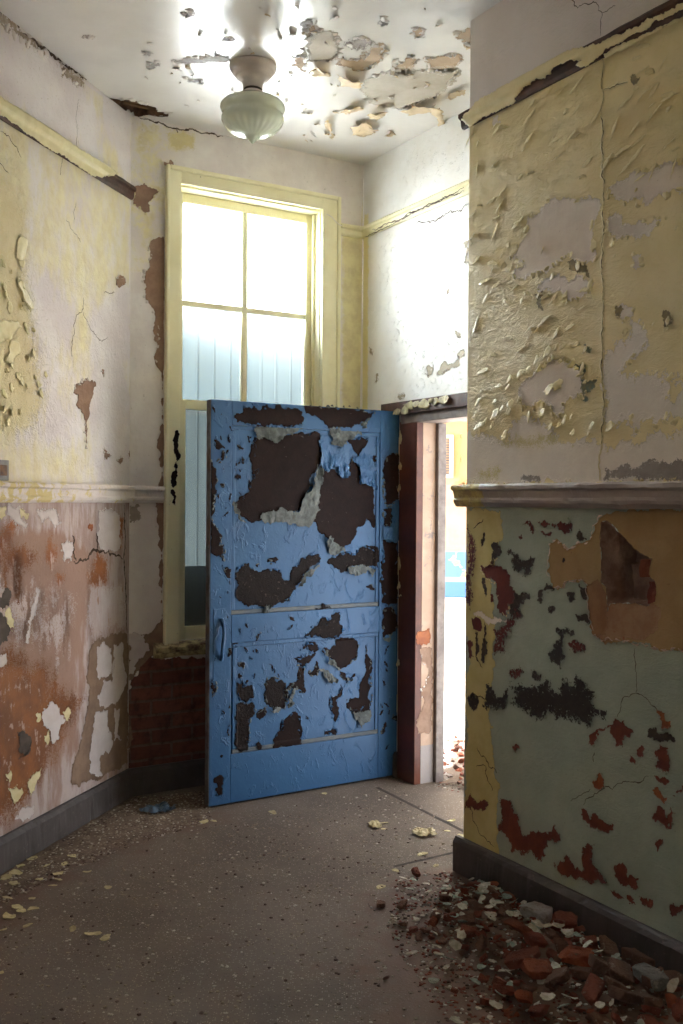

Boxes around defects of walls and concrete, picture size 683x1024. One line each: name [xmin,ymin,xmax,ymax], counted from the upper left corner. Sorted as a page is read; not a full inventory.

crack [140,118,220,137]
peeling [141,35,235,85]
peeling [265,5,471,142]
peeling [425,43,683,377]
peeling [0,156,48,444]
peeling [460,303,683,484]
spalling [0,587,12,656]
crack [72,508,127,627]
flaking render [71,237,218,787]
peeling [285,613,396,750]
spalling [465,509,683,852]
peeling [464,793,654,909]